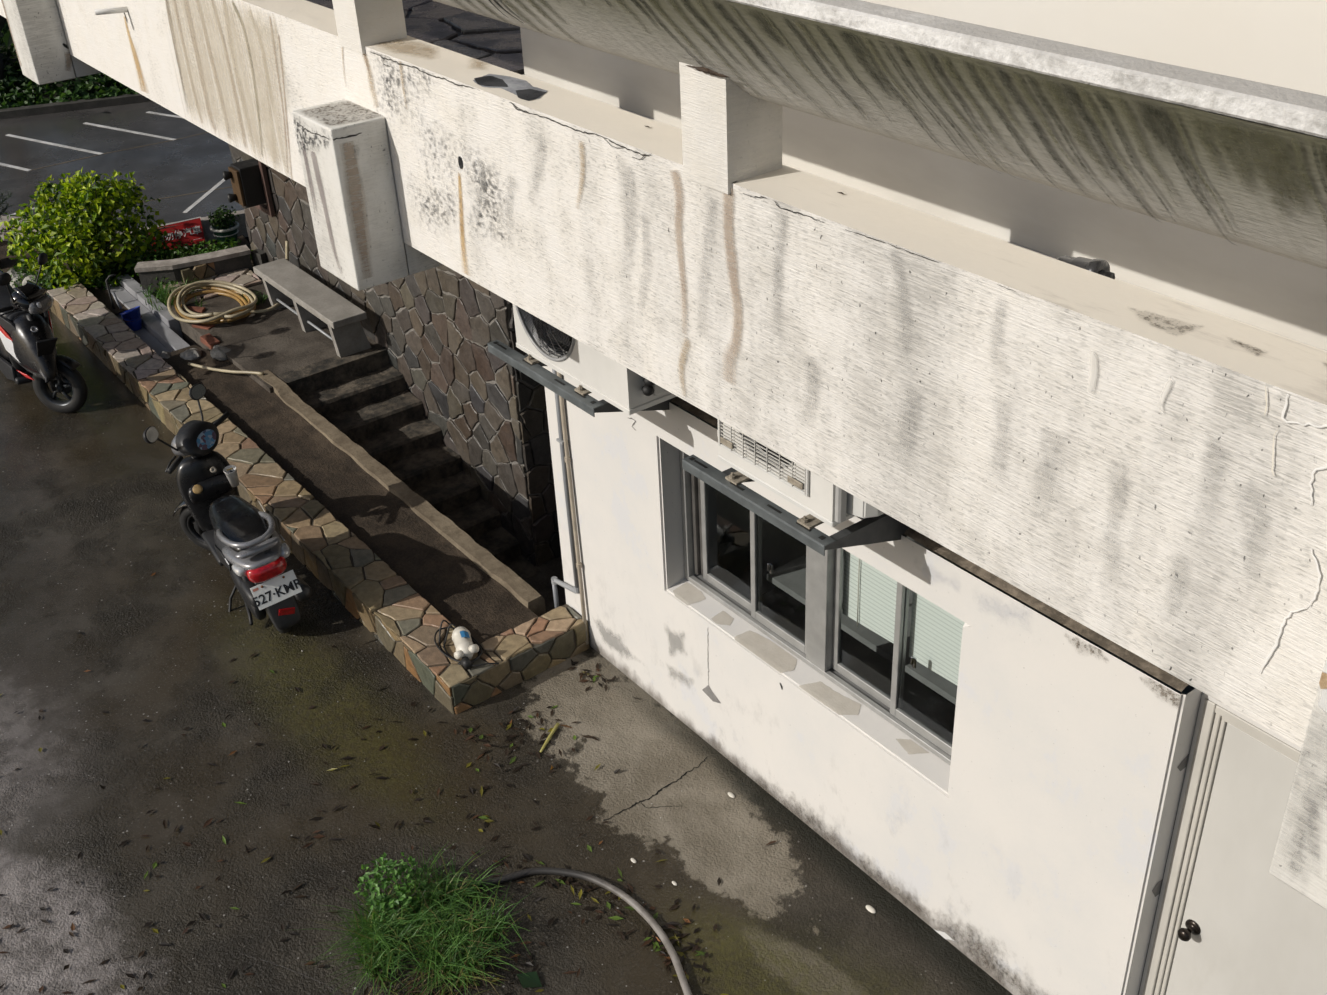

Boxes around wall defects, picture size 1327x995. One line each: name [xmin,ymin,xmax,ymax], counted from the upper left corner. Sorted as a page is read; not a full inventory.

damp [454,0,563,32]
damp [605,0,1327,227]
damp [473,164,511,237]
damp [673,172,685,307]
damp [711,193,741,366]
crack [1264,386,1327,505]
crack [1259,548,1321,674]
peeling [1319,672,1327,689]
crack [603,757,707,821]
damp [946,926,1035,995]